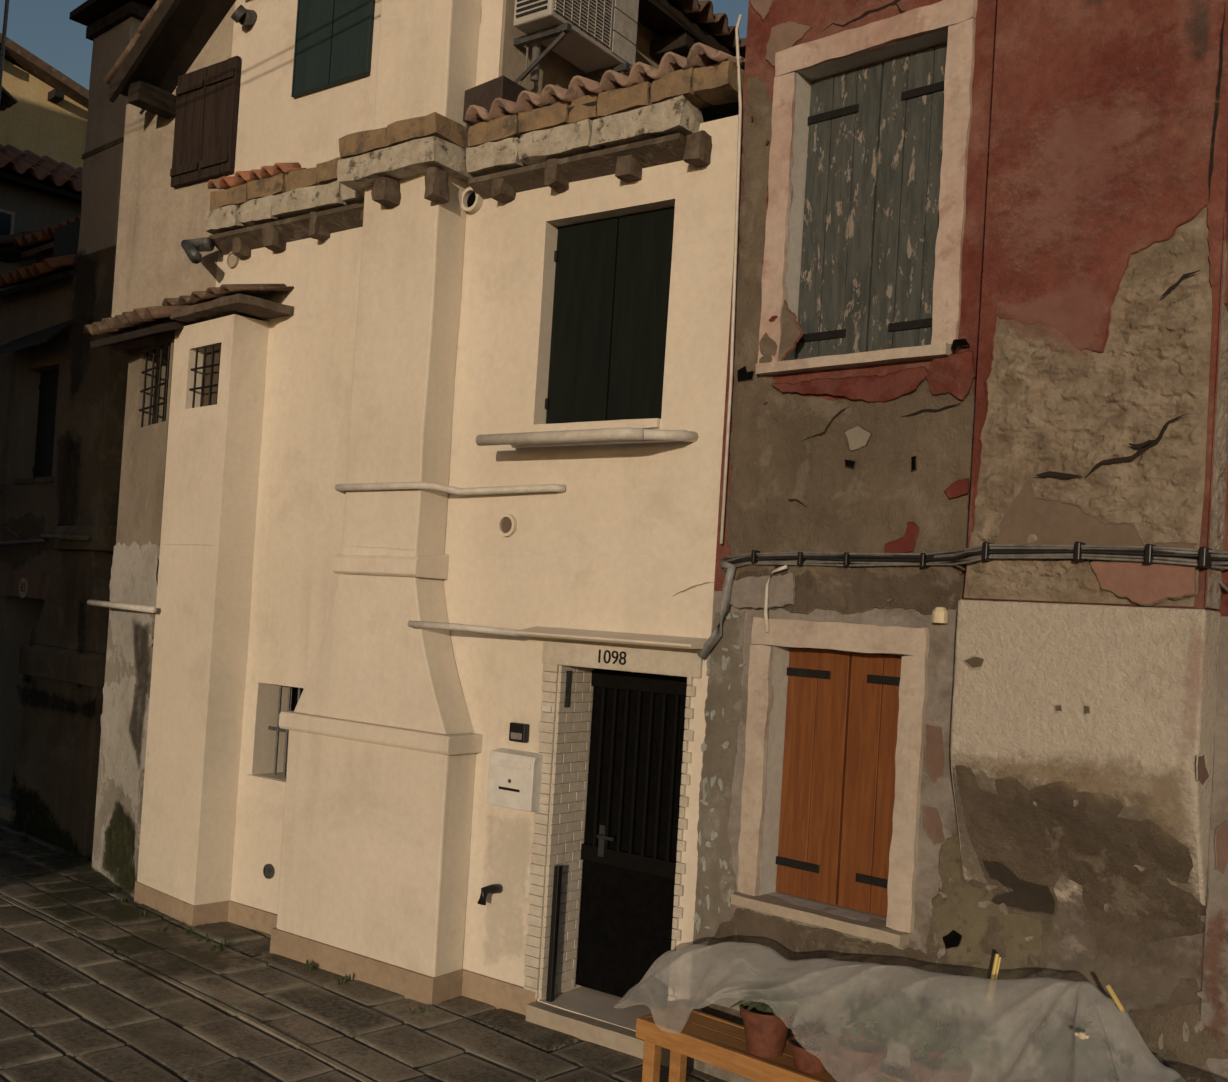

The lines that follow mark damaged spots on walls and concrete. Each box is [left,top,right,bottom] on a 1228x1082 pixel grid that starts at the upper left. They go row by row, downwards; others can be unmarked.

flaking render [749,0,812,68]
crack [821,0,932,32]
crack [1209,12,1225,198]
crack [1034,413,1190,478]
flaking render [693,75,1228,1043]
damp [129,624,148,767]